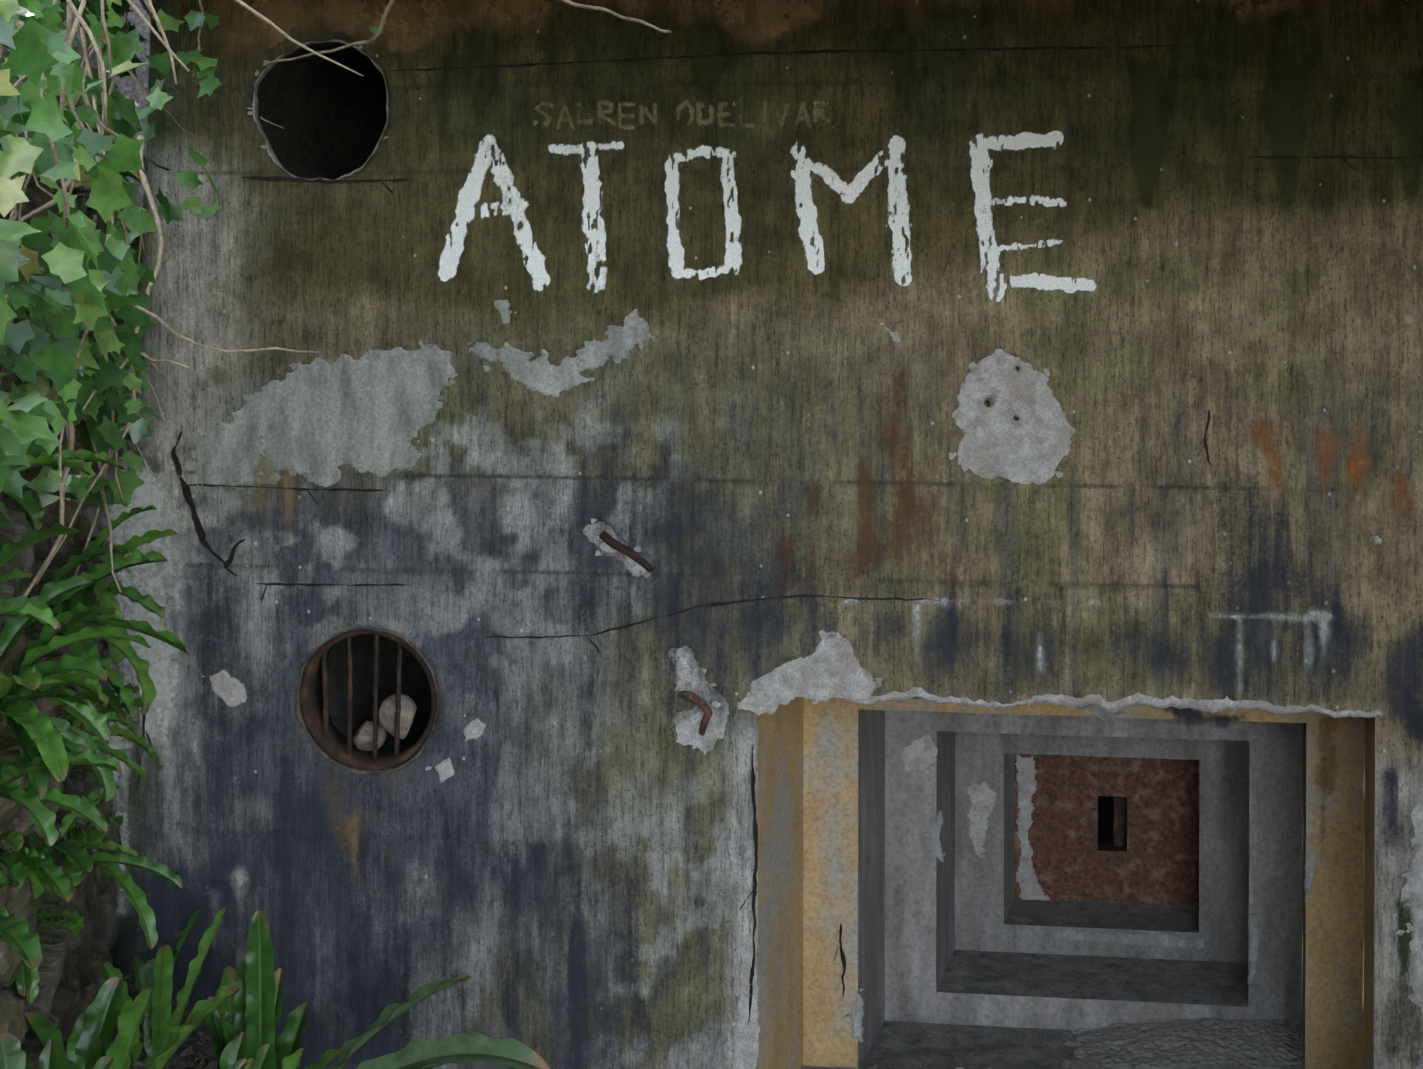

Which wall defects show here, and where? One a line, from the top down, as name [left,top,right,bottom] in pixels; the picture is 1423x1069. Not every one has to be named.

leakage [229,0,558,51]
leakage [676,0,828,43]
spalling [494,300,512,324]
peeling [186,308,655,491]
spalling [949,349,1075,484]
crack [170,430,409,601]
spalling [668,630,1383,753]
spalling [1391,782,1423,1013]